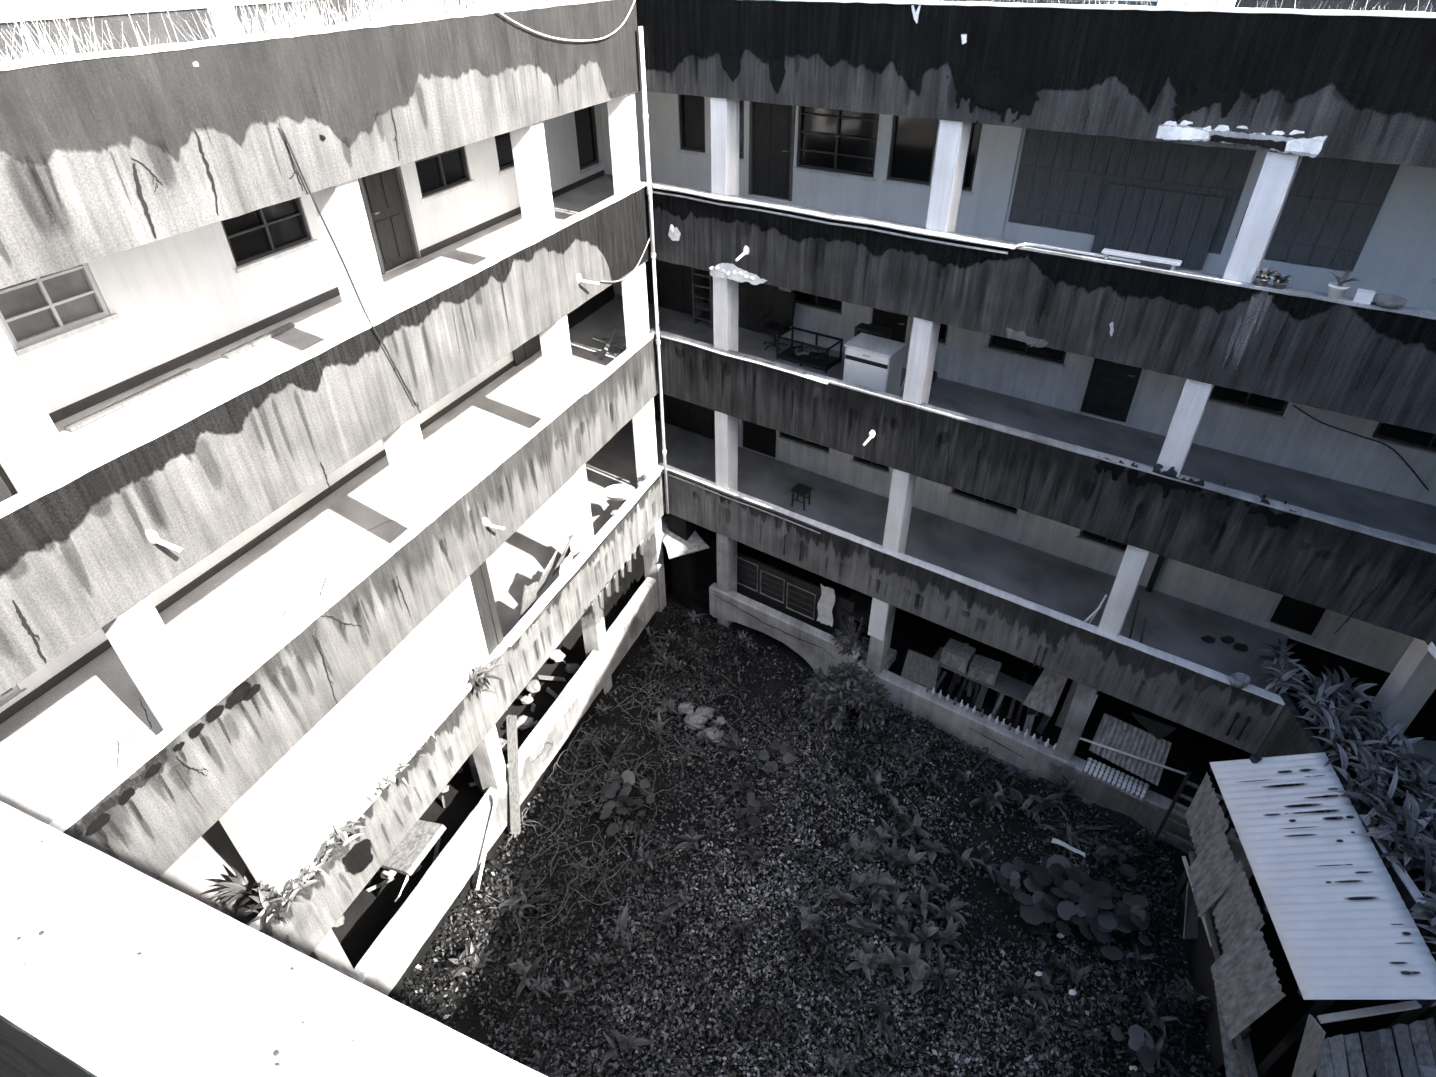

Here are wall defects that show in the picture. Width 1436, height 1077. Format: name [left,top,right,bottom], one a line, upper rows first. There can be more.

crack [131,158,163,238]
crack [194,130,219,215]
water stain [0,0,1436,164]
water stain [0,186,1436,576]
crack [12,600,47,663]
crack [271,516,404,703]
water stain [689,480,1279,715]
water stain [260,672,488,937]